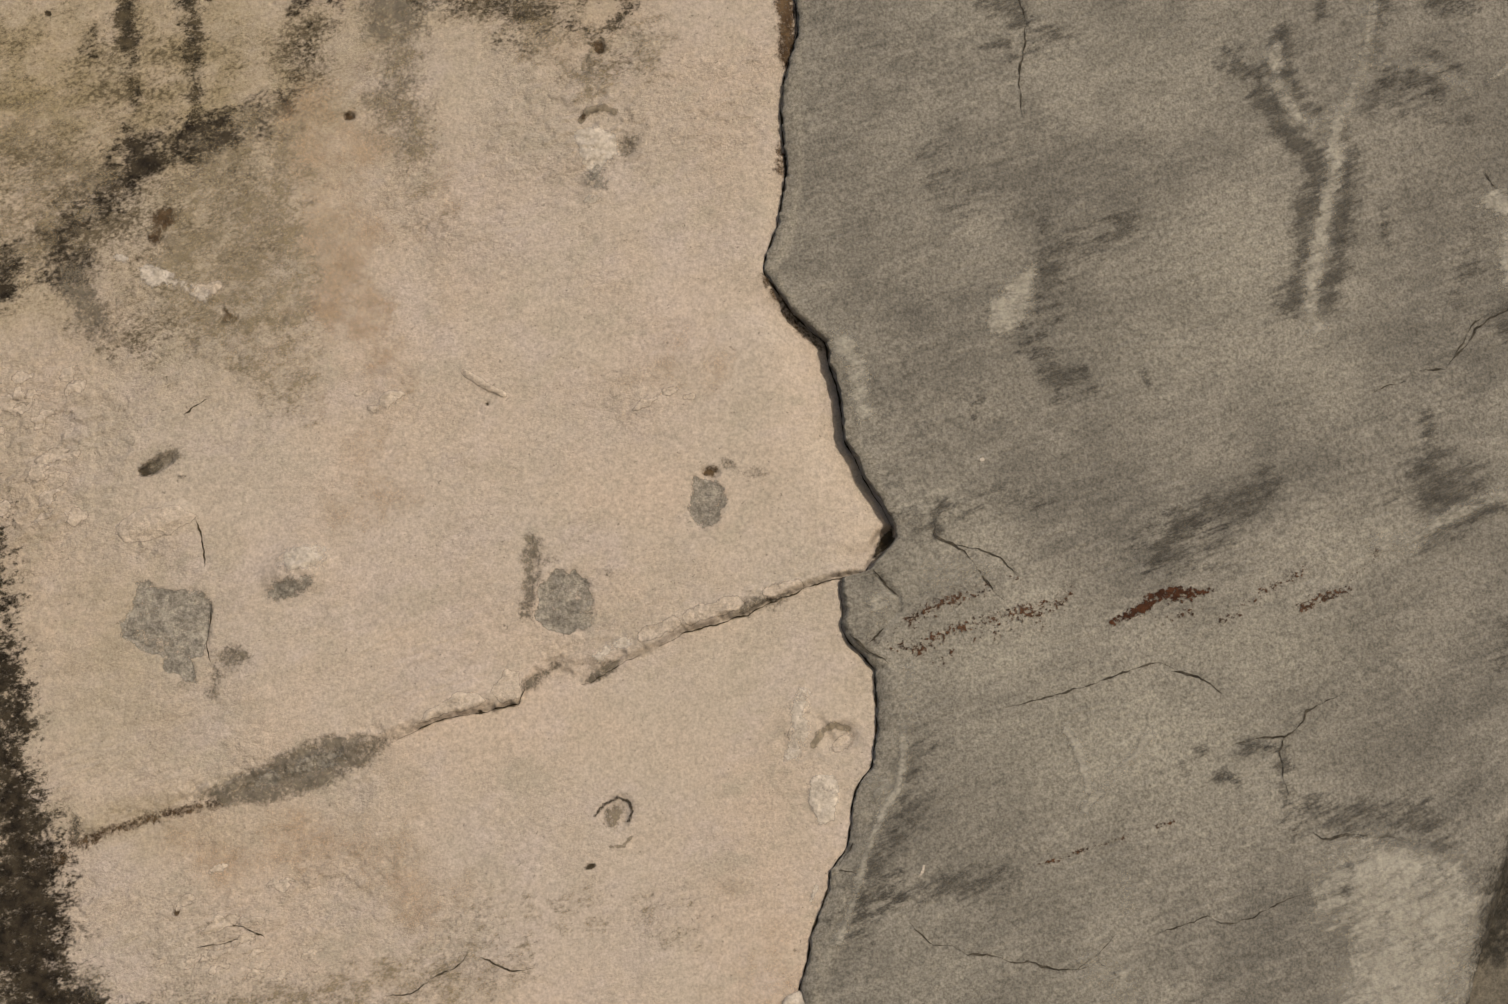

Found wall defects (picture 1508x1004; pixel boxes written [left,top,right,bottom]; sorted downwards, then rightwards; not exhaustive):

leakage [0,0,674,413]
flaking render [687,461,732,528]
crack [196,521,206,567]
flaking render [120,580,250,698]
flaking render [519,534,593,635]
corrosion [866,581,1076,667]
corrosion [1109,566,1307,627]
corrosion [1295,549,1379,612]
leakage [0,501,223,1004]
crack [399,689,525,739]
spalling [811,722,854,752]
leakage [233,955,514,1004]